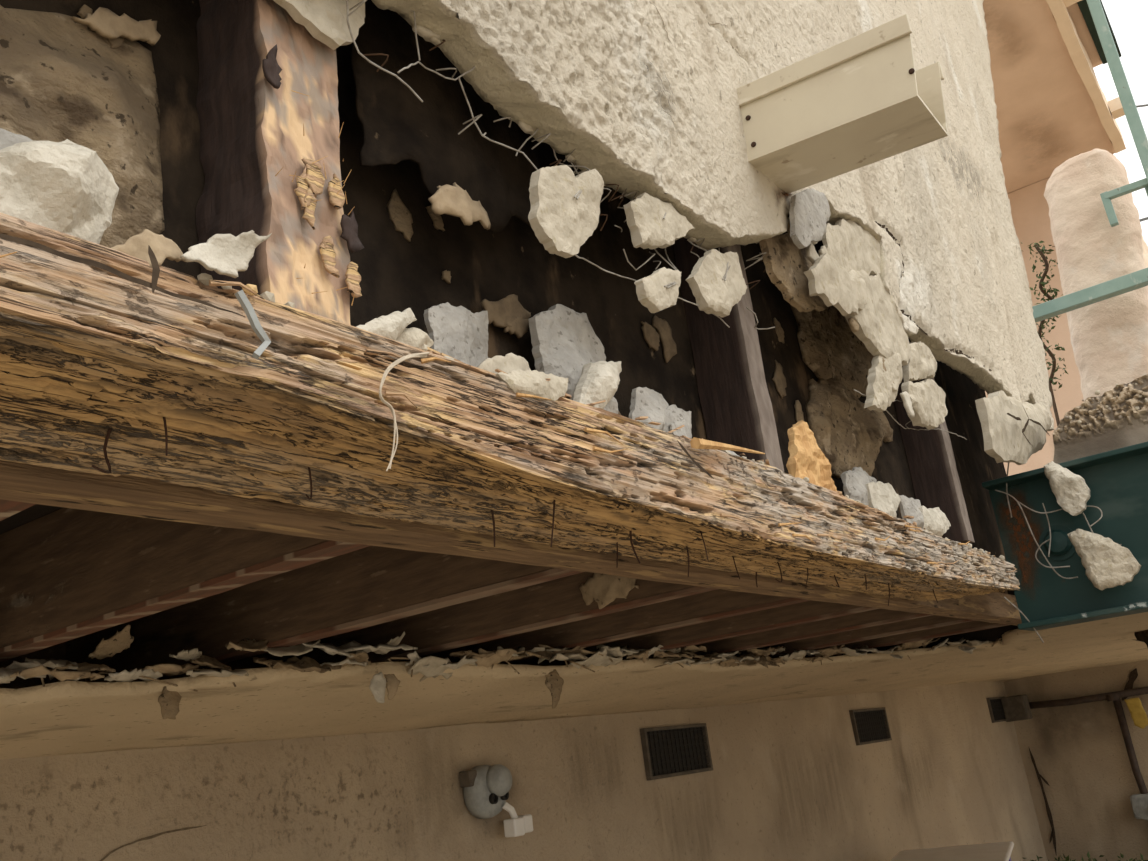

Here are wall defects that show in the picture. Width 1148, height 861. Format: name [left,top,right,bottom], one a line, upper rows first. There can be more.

spalling [412,25,441,45]
peeling [262,44,282,89]
spalling [517,121,536,135]
peeling [294,158,364,298]
peeling [759,188,915,418]
peeling [477,353,531,374]
corrosion [1000,493,1041,587]
spalling [1134,630,1148,648]
peeling [0,625,1002,720]
crack [1029,748,1056,853]
crack [100,825,206,861]